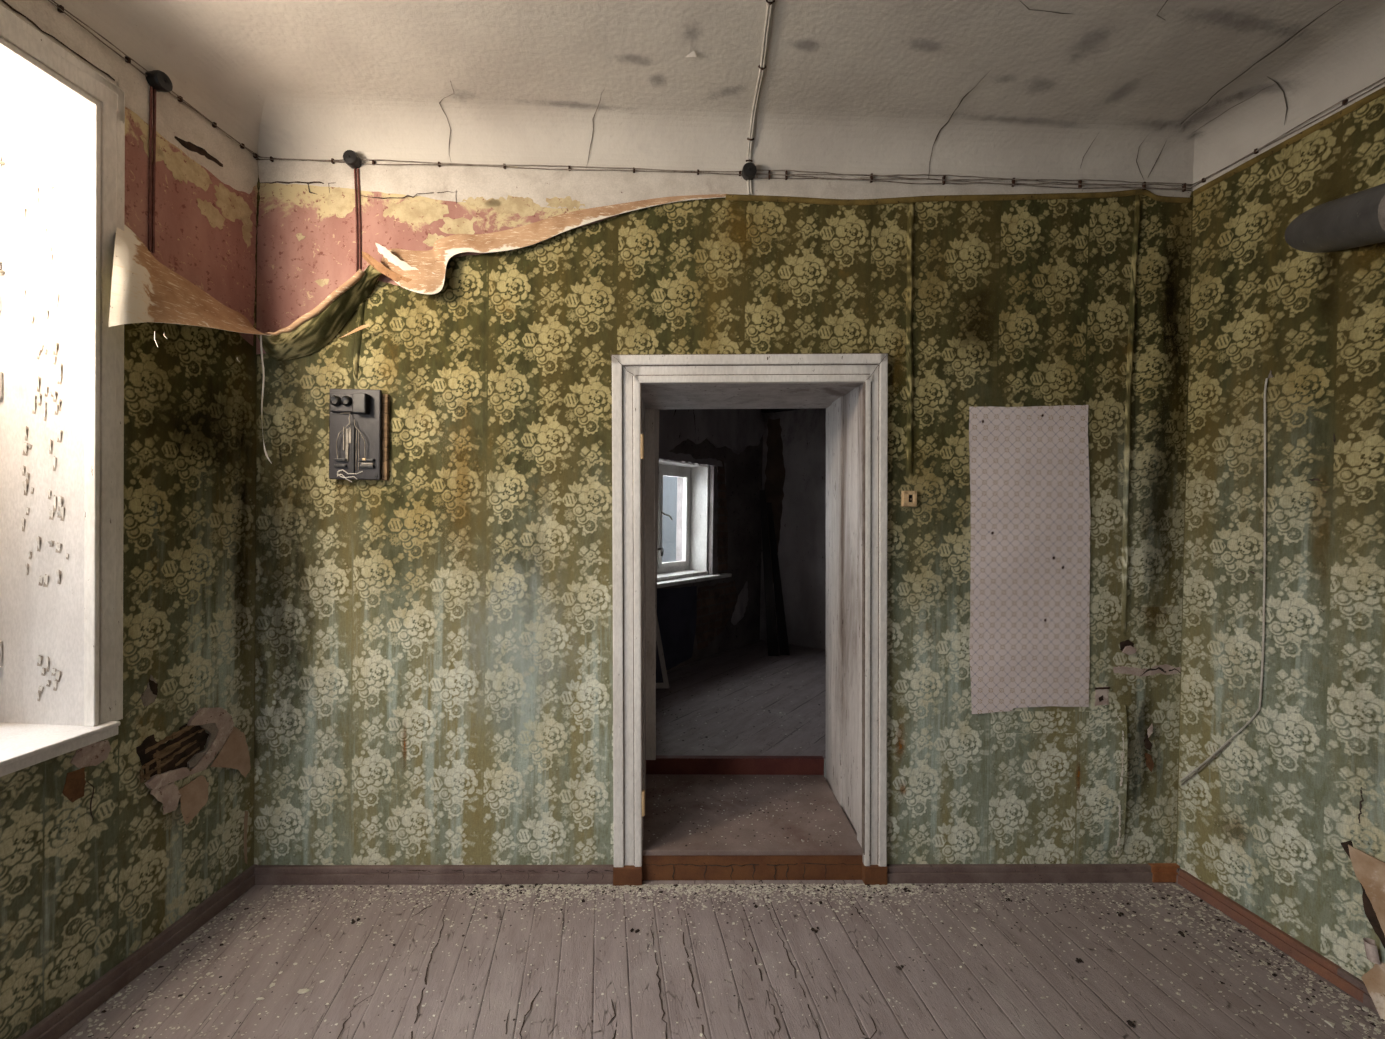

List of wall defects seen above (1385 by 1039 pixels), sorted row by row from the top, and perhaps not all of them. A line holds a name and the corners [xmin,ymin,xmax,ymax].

crack [1,0,115,81]
crack [928,70,991,178]
crack [1136,0,1344,179]
peeling [140,135,253,248]
peeling [325,187,365,218]
peeling [383,195,586,246]
peeling [21,342,69,587]
peeling [1113,640,1181,677]
peeling [62,740,111,802]
spalling [136,707,251,825]
spalling [1360,883,1385,948]